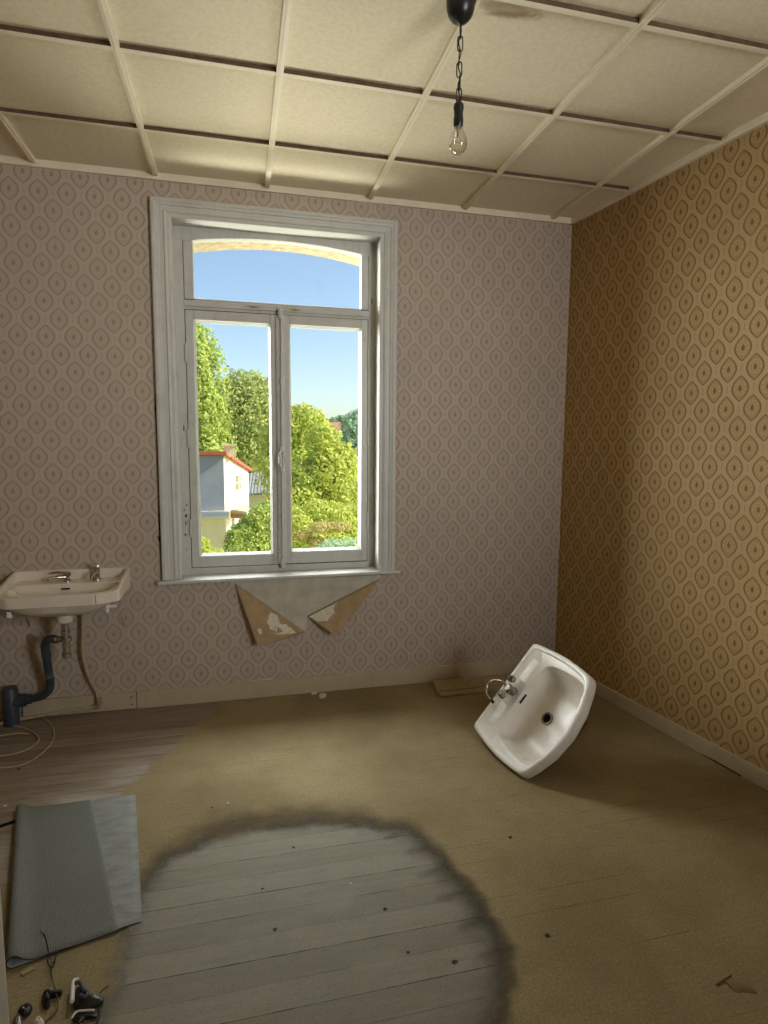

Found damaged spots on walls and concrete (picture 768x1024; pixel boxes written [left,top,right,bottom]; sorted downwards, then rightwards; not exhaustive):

flaking render [231,575,381,635]